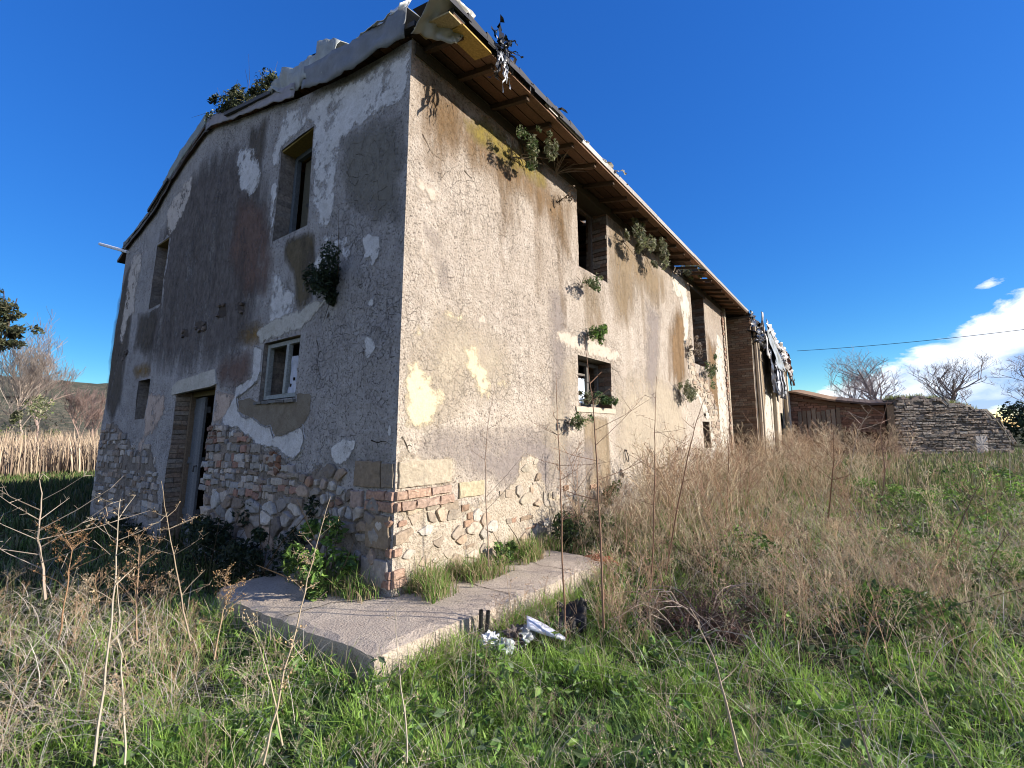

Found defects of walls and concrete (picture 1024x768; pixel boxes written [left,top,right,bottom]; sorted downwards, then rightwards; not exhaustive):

peeling [237,148,261,196]
peeling [272,53,410,268]
leakage [425,85,564,243]
peeling [167,176,192,234]
peeling [270,182,278,235]
leakage [107,121,269,419]
peeling [205,274,329,475]
peeling [404,361,445,427]
peeling [464,345,505,399]
peeling [331,439,355,464]
flaking render [364,484,482,528]
flaking render [381,548,407,590]